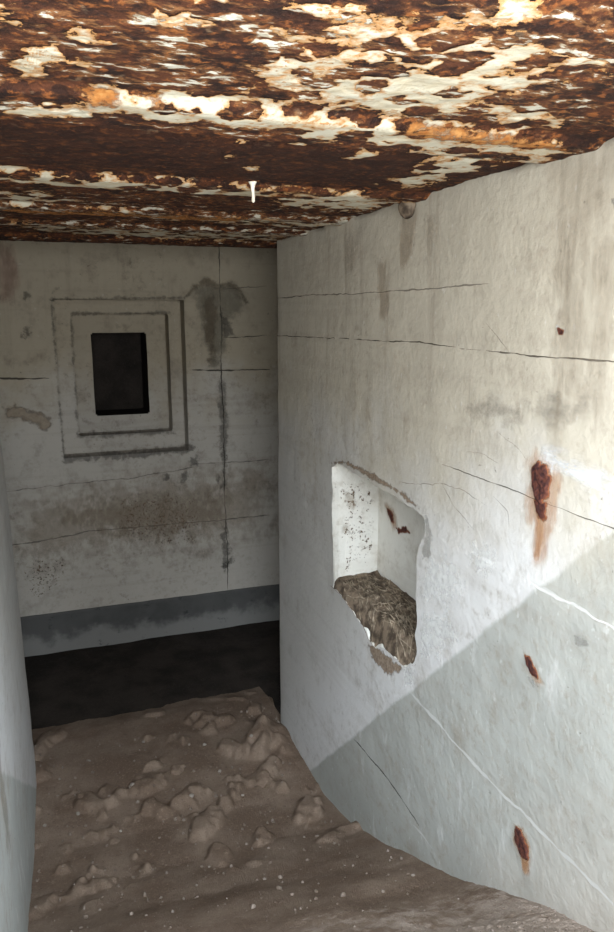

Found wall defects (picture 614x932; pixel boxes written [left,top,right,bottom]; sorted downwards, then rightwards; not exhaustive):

corrosion [79,86,121,109]
corrosion [404,120,567,152]
peeling [6,405,51,430]
crack [9,249,614,588]
spalling [334,461,416,506]
corrosion [531,460,552,522]
corrosion [387,509,410,534]
crack [531,583,614,630]
spalling [368,644,412,683]
corrosion [525,655,538,679]
crack [357,742,432,848]
corrosion [514,826,529,861]